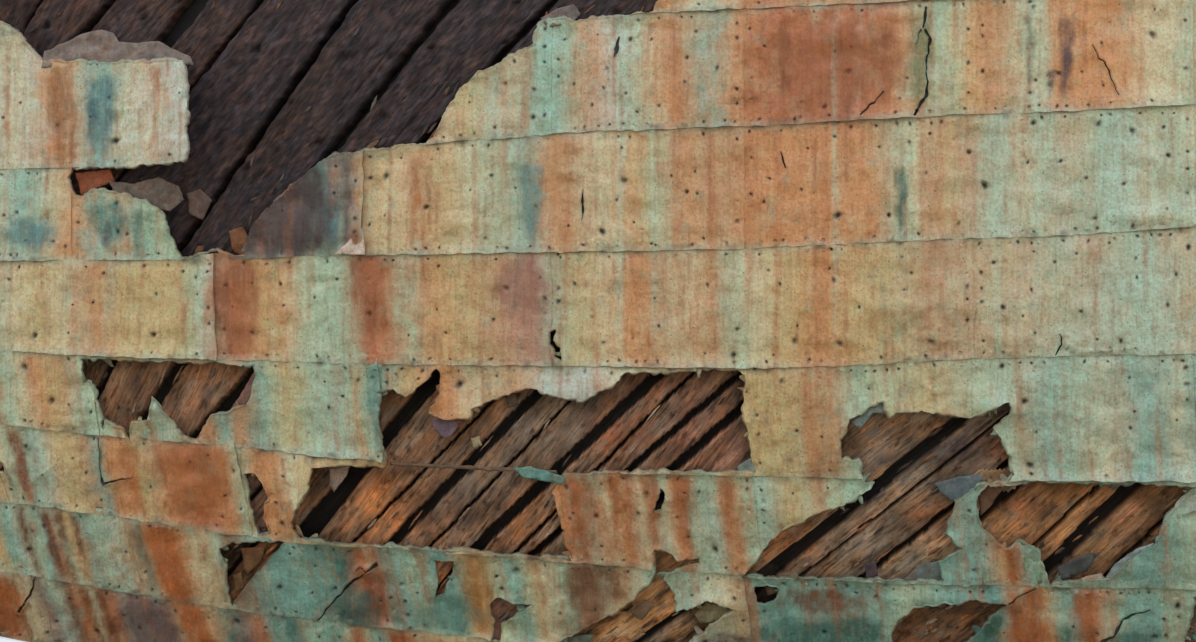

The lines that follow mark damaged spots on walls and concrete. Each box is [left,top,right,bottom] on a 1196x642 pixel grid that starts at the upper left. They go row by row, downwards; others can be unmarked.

peeling [41,30,195,68]
crack [914,6,933,116]
crack [860,90,884,115]
peeling [75,169,212,220]
peeling [232,373,255,407]
peeling [329,466,350,492]
peeling [390,462,565,484]
peeling [935,473,1007,515]
rust [43,515,82,565]
peeling [1000,541,1154,588]
peeling [694,602,731,637]
crack [1097,608,1151,642]